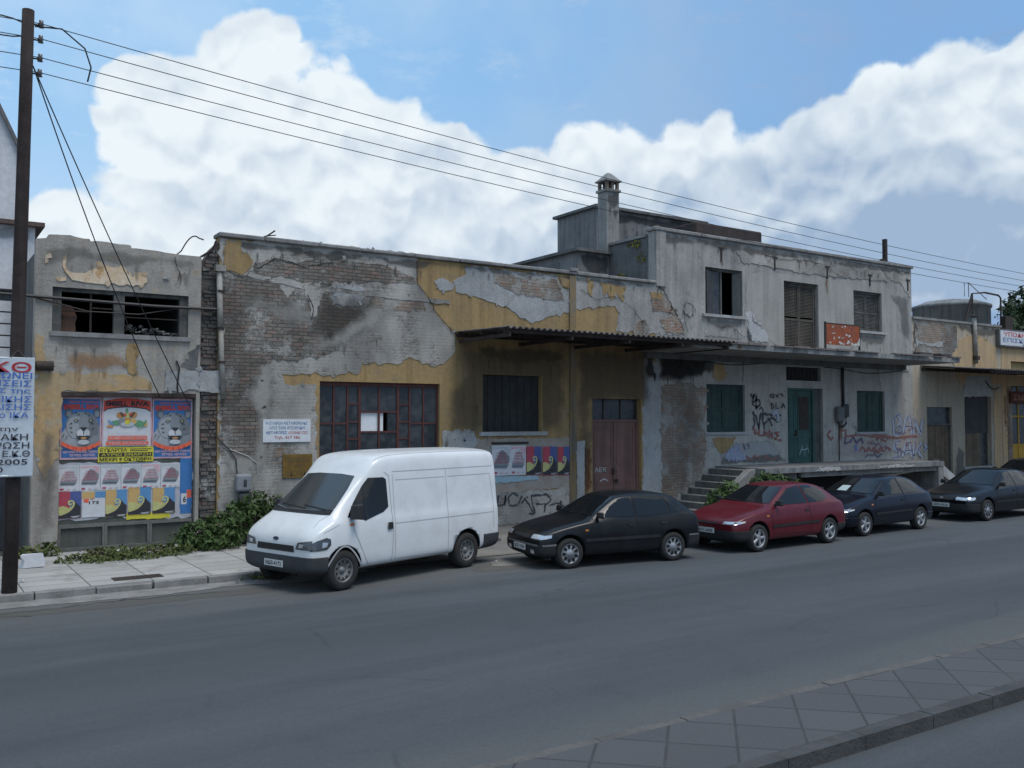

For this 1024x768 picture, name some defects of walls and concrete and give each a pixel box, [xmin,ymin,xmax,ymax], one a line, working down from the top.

peeling [45,253,147,288]
peeling [216,238,684,526]
flaking render [641,358,736,499]
water stain [684,360,713,380]
peeling [912,319,1023,468]